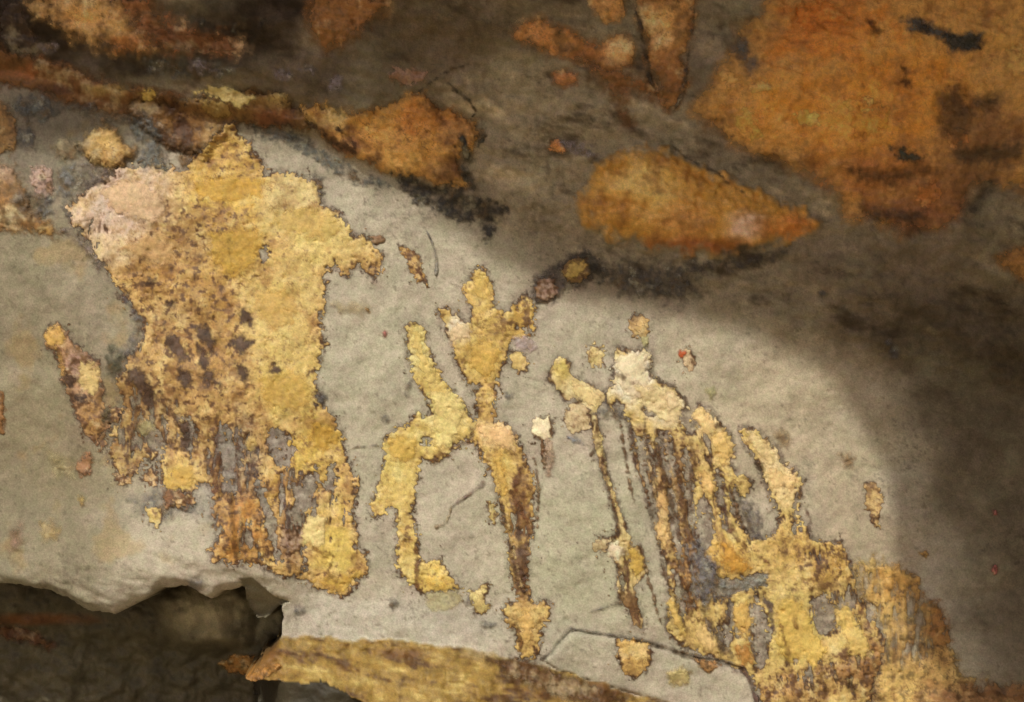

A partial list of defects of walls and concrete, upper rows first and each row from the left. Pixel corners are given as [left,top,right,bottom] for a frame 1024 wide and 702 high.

corrosion [0,0,479,187]
corrosion [513,0,698,109]
corrosion [693,0,1024,234]
water stain [11,94,892,702]
peeling [240,578,290,619]
crack [563,601,758,702]